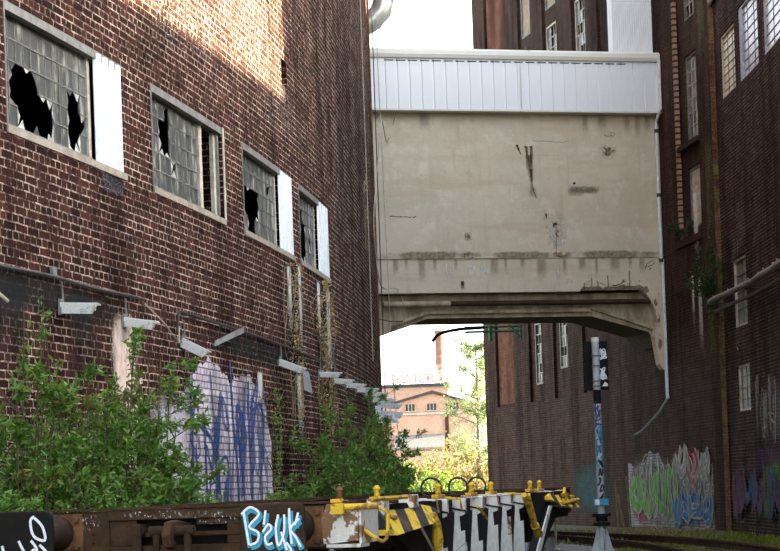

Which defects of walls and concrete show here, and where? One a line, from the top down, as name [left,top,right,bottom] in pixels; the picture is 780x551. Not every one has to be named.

rust [524,146,533,184]
crack [533,188,566,258]
leakage [403,252,488,287]
spalling [580,271,663,349]